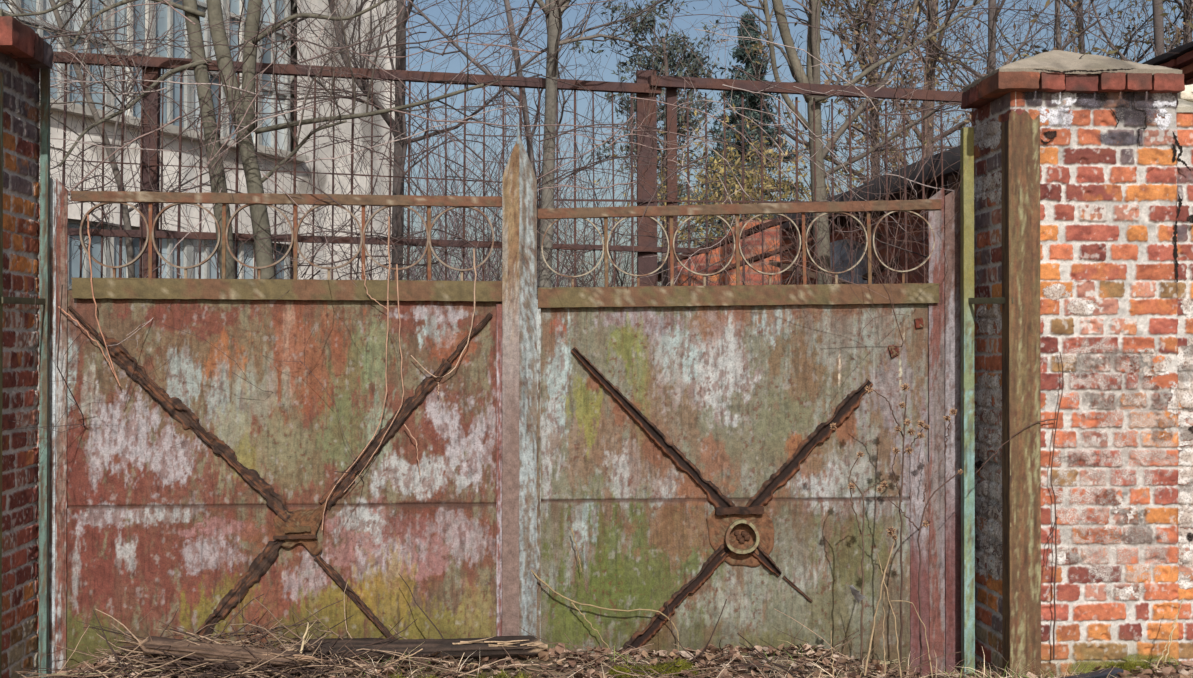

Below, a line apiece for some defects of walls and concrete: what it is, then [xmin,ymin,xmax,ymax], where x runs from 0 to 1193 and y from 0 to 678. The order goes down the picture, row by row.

crack [1035,54,1193,282]